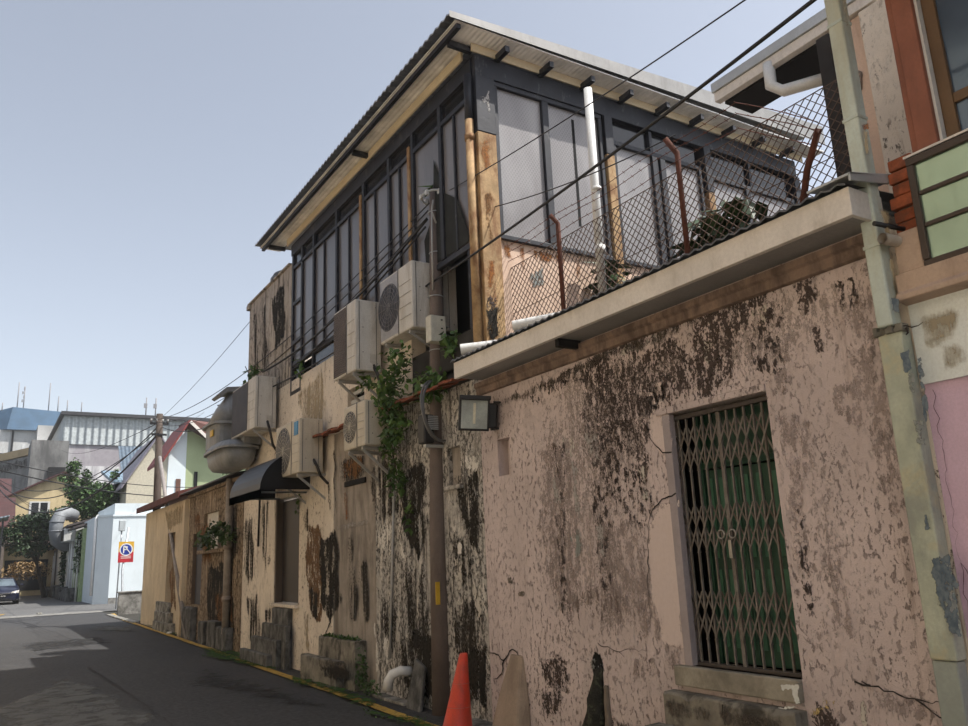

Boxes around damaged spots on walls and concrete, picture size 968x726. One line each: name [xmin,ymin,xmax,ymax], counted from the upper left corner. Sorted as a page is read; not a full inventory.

leakage [253,286,286,373]
leakage [195,501,270,631]
leakage [247,594,271,641]
leakage [341,455,432,703]
leakage [453,471,488,710]
crack [492,649,518,679]
leakage [505,276,905,726]
crack [854,680,941,718]
peeling [931,554,961,637]
crack [933,391,968,602]